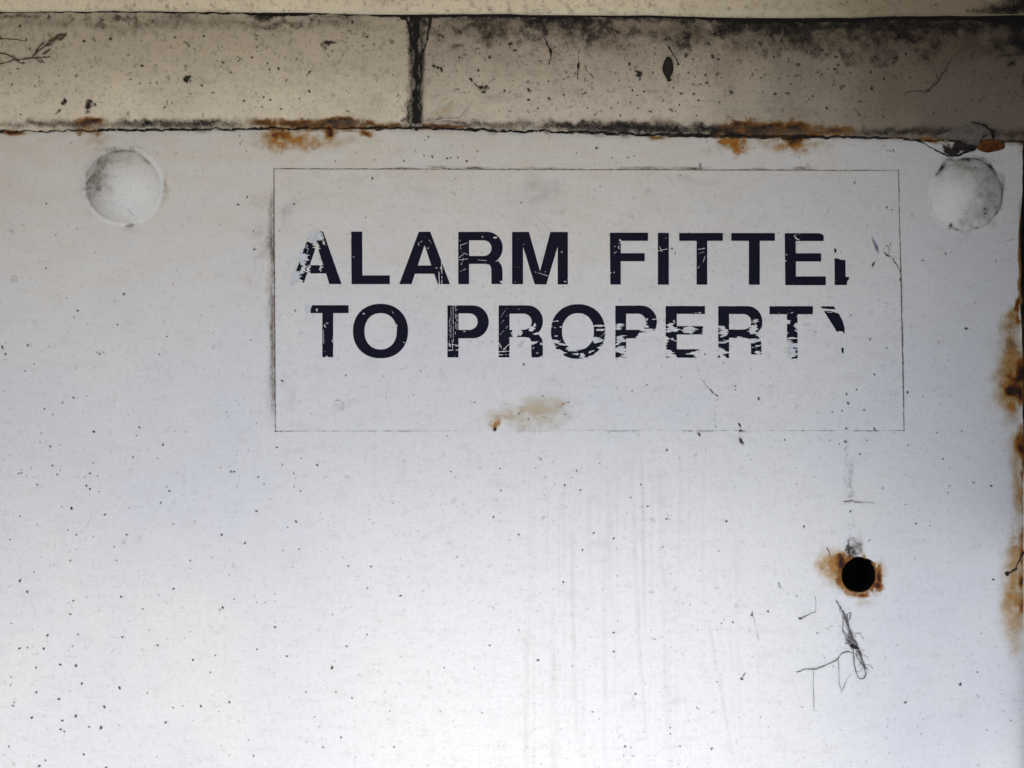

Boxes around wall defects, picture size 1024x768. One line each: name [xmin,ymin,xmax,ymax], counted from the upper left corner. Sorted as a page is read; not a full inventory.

damp [865,0,1024,90]
corrosion [252,116,403,148]
corrosion [713,118,855,154]
peeling [903,121,995,157]
corrosion [1000,247,1023,412]
corrosion [1015,426,1023,514]
corrosion [821,548,883,598]
corrosion [1006,528,1024,613]